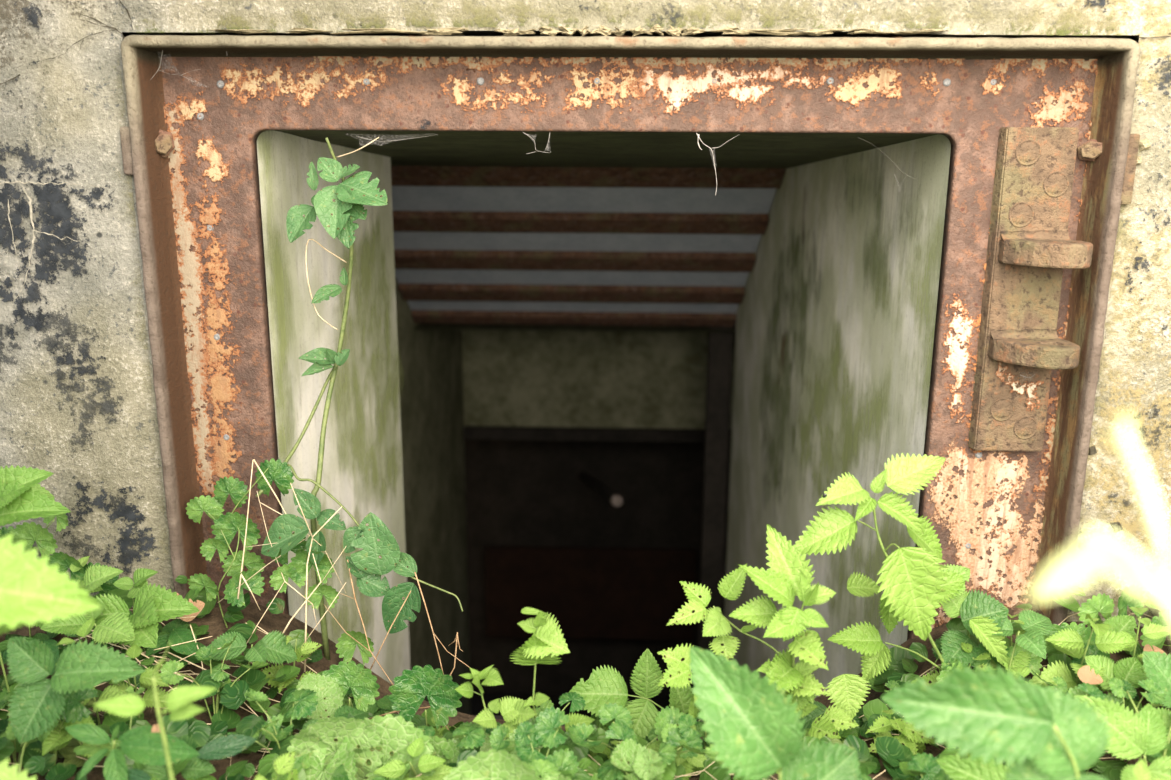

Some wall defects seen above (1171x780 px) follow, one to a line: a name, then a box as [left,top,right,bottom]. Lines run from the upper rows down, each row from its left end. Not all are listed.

crack [0,0,133,84]
water stain [762,234,883,507]
water stain [864,178,887,292]
water stain [911,225,939,403]
rust [962,262,987,455]
water stain [1084,374,1171,573]
water stain [830,514,909,628]